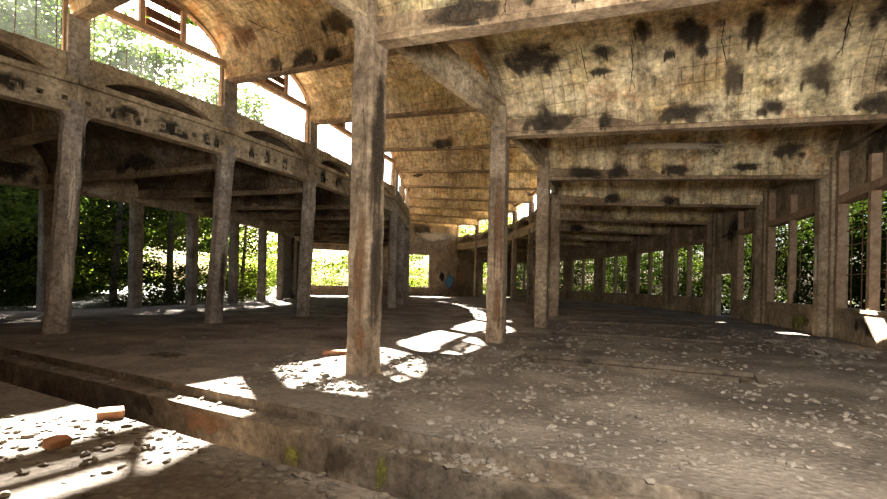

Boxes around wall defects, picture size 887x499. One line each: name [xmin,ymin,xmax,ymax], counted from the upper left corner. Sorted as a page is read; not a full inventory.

damp [321,9,354,36]
damp [450,3,497,27]
damp [700,27,710,58]
damp [504,56,530,77]
damp [724,64,743,95]
damp [800,61,831,96]